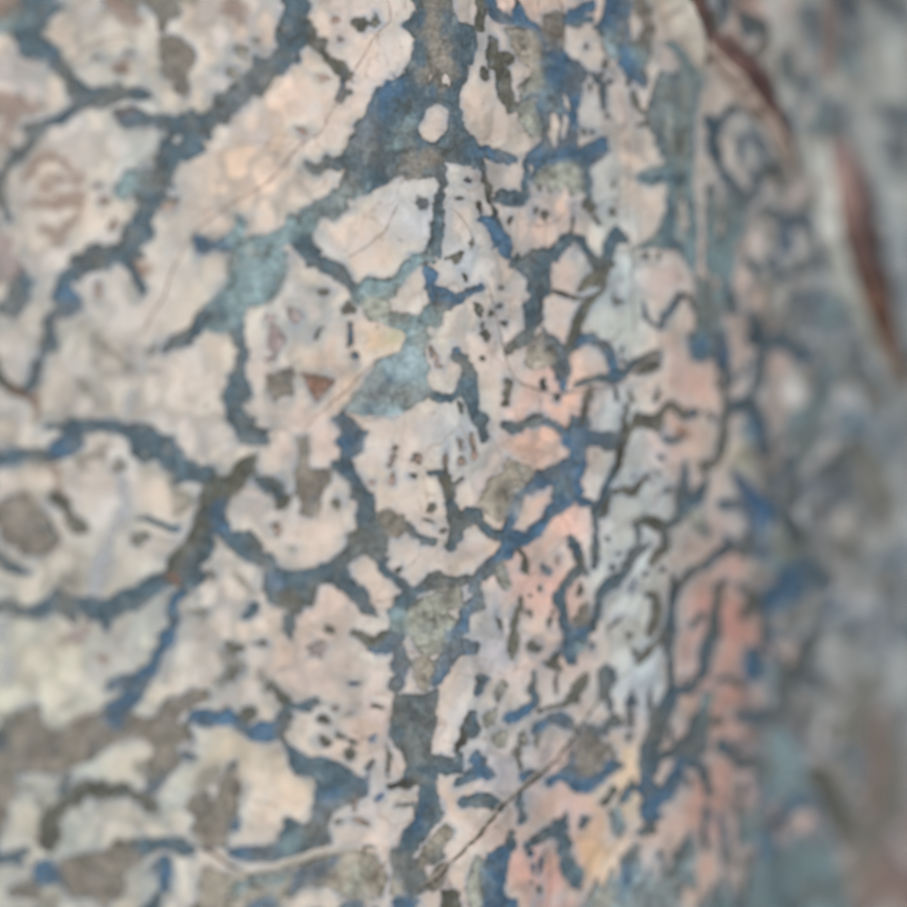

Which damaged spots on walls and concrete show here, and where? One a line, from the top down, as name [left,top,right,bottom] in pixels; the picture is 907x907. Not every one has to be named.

peeling [708,0,796,79]
peeling [0,0,711,907]
crack [417,539,670,889]